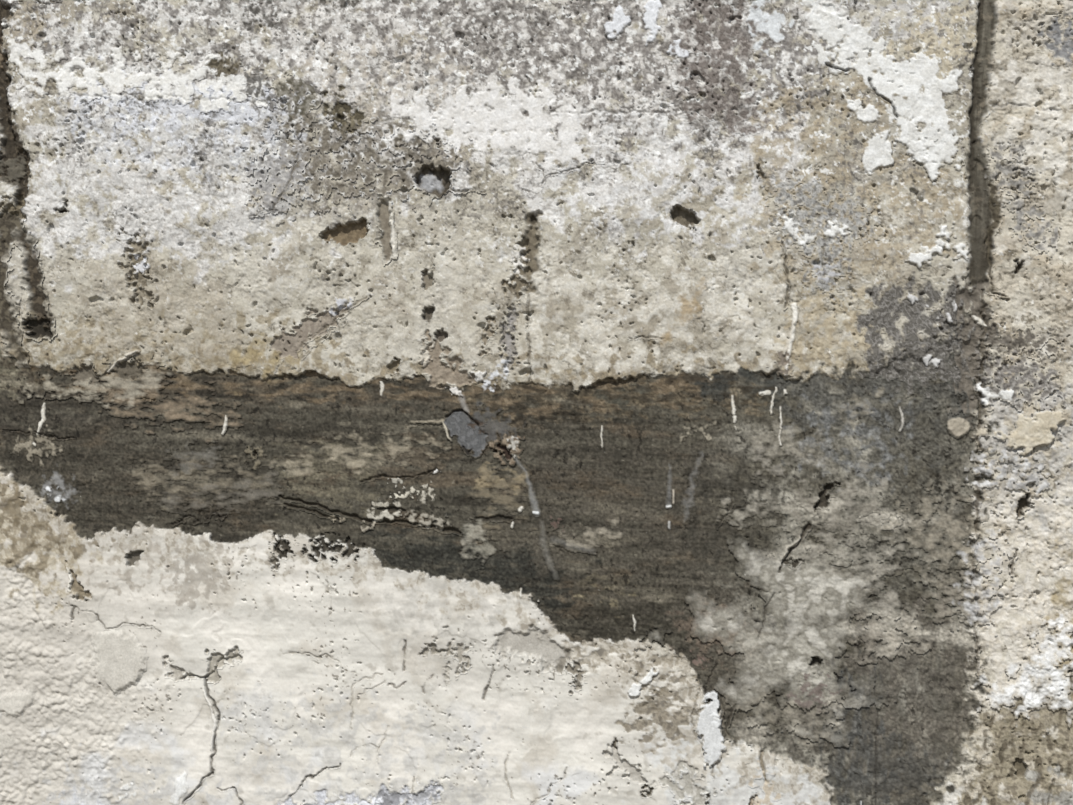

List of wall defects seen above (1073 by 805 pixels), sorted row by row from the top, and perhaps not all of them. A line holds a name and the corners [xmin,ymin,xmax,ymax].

crack [0,0,110,400]
spalling [53,199,70,214]
peeling [0,209,1066,805]
crack [69,604,162,634]
crack [181,674,244,805]
crack [282,639,435,797]